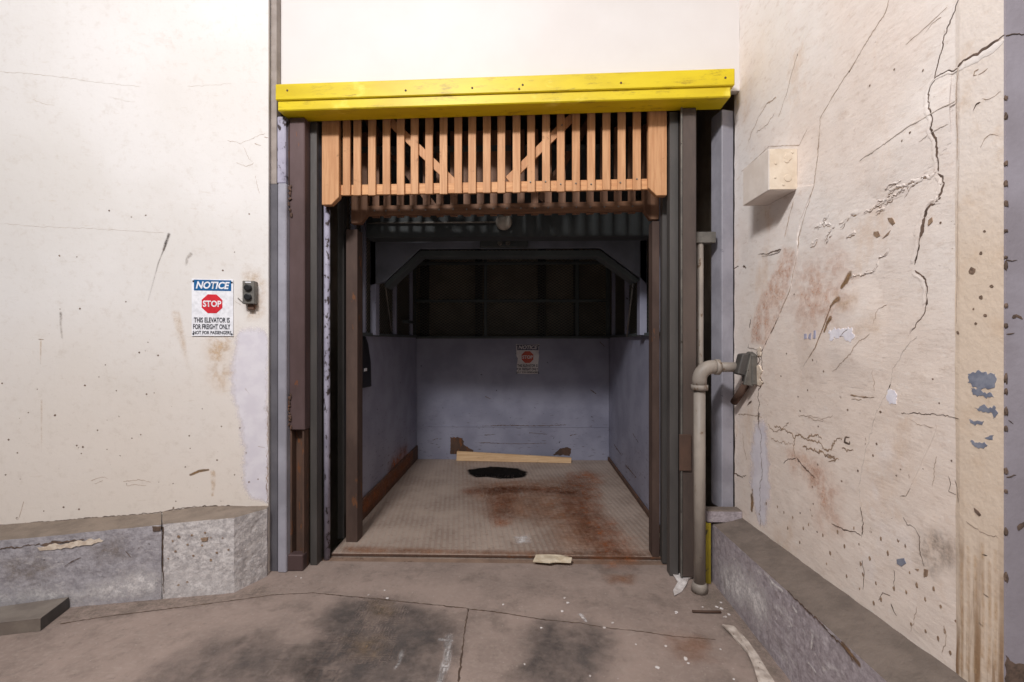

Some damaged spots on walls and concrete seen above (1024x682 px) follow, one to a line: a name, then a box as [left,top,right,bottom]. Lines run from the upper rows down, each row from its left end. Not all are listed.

spalling [810,173,935,279]
crack [733,0,1024,537]
corrosion [809,272,851,357]
peeling [968,370,1008,449]
spalling [37,538,103,551]
corrosion [469,474,651,560]
crack [862,562,917,627]